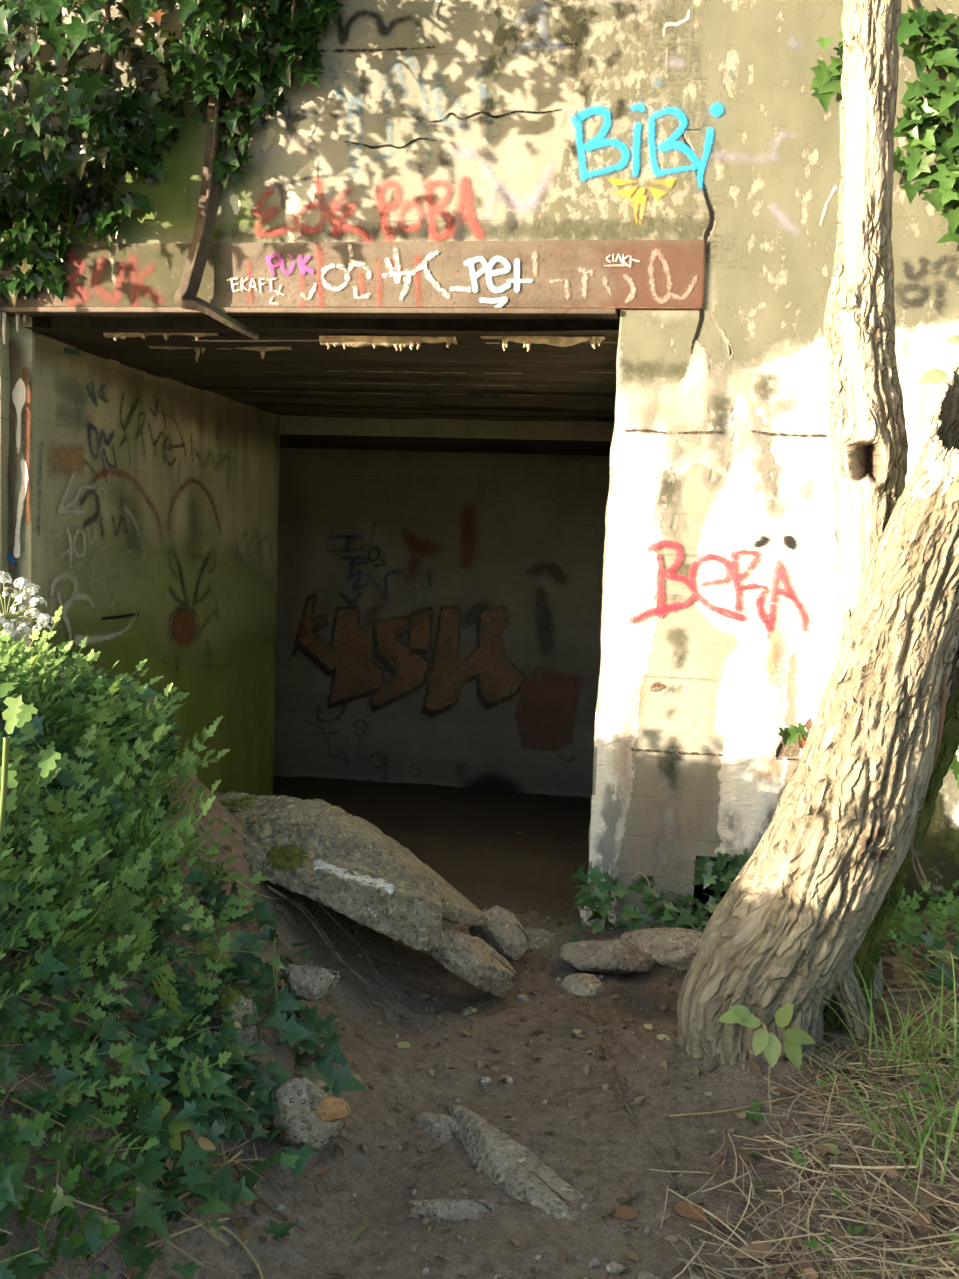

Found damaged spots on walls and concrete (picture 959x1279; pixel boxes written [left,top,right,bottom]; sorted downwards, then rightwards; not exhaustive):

water stain [901,0,959,54]
crack [345,109,562,149]
water stain [891,33,959,486]
peeling [7,378,28,564]
water stain [307,0,843,929]
spalling [631,748,723,756]
spalling [776,740,804,760]